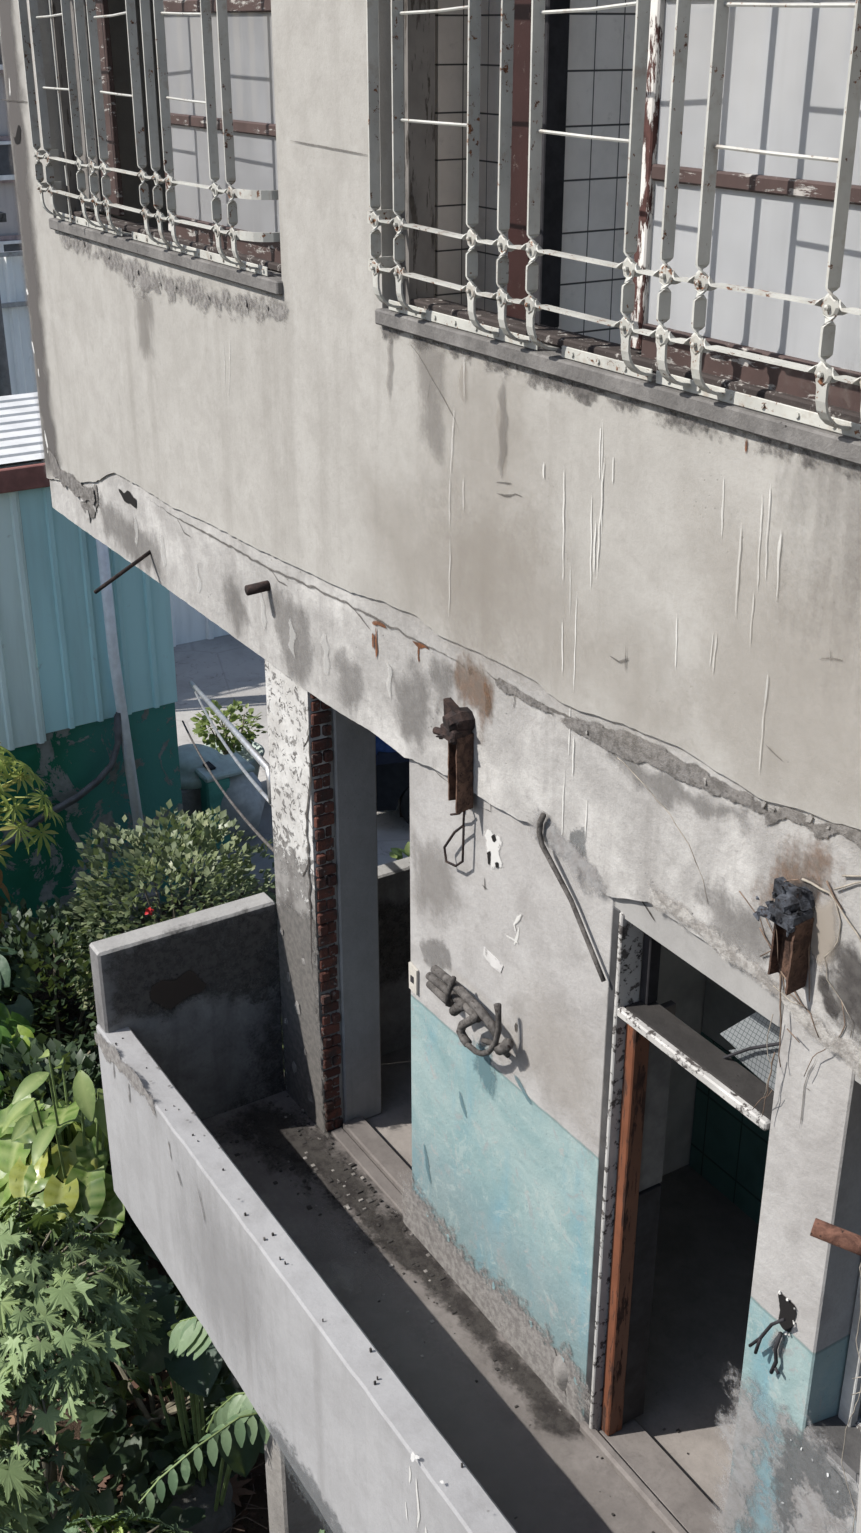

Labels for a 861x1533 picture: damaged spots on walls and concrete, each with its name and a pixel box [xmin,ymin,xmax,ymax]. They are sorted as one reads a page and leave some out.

spalling [44,431,98,523]
spalling [119,489,136,508]
corrosion [455,661,492,717]
peeling [275,898,328,1139]
leakage [818,944,861,1042]
leakage [109,901,581,1437]